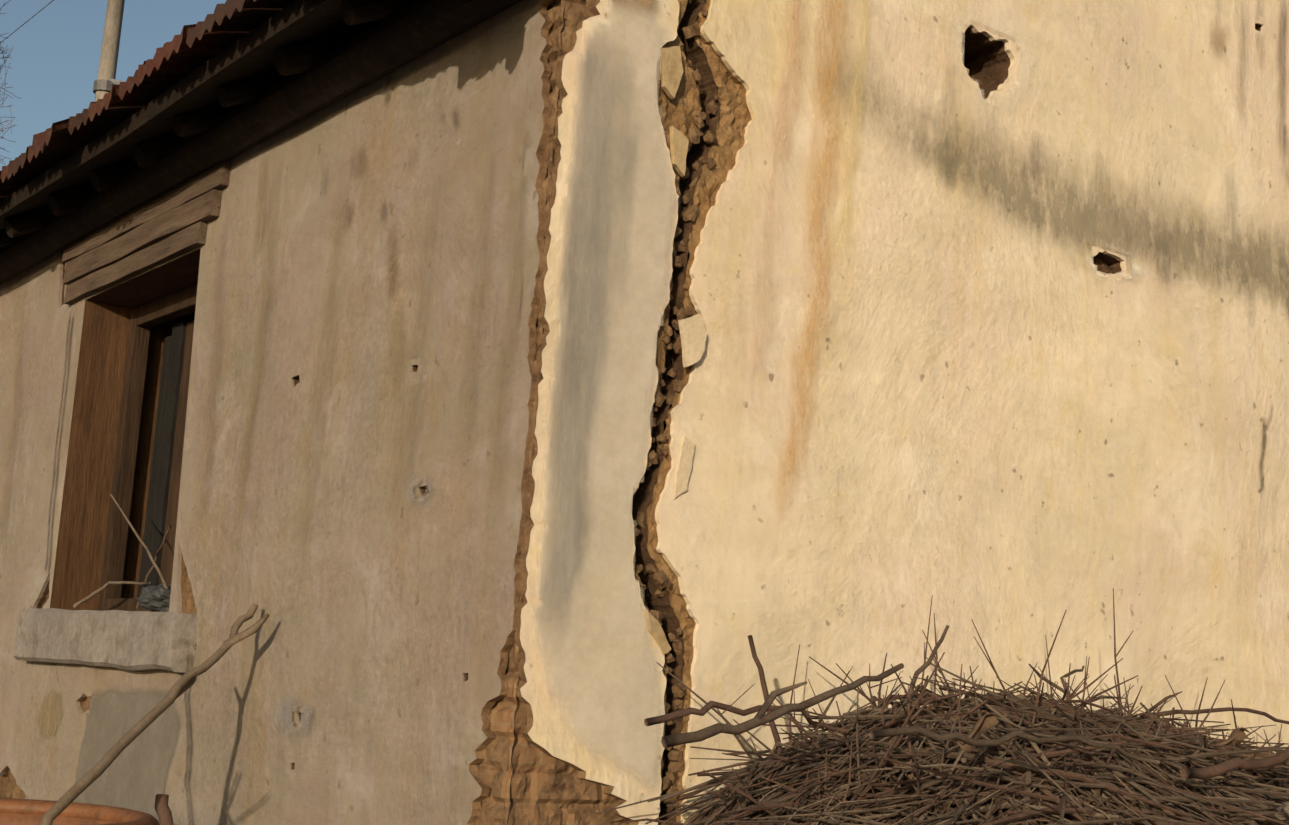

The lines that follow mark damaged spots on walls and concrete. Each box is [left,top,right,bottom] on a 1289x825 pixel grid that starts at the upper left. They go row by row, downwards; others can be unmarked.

leakage [919,135,1287,294]
spalling [1091,250,1139,276]
crack [631,0,755,825]
spalling [76,693,91,715]
spalling [0,766,27,799]